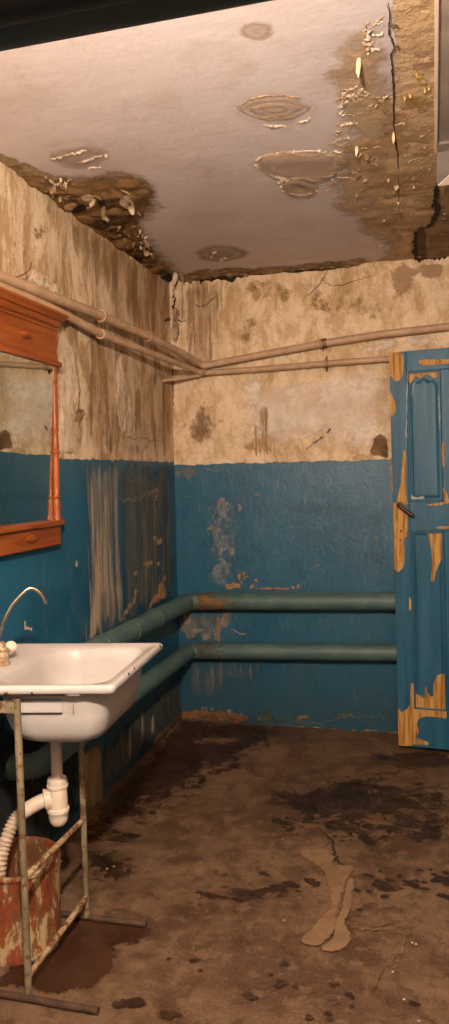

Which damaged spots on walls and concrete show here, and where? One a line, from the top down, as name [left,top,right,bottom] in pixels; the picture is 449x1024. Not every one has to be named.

crack [383,3,400,212]
flaking render [411,227,427,260]
damp [191,408,209,442]
damp [85,464,173,641]
damp [267,752,449,845]
crack [314,826,352,940]